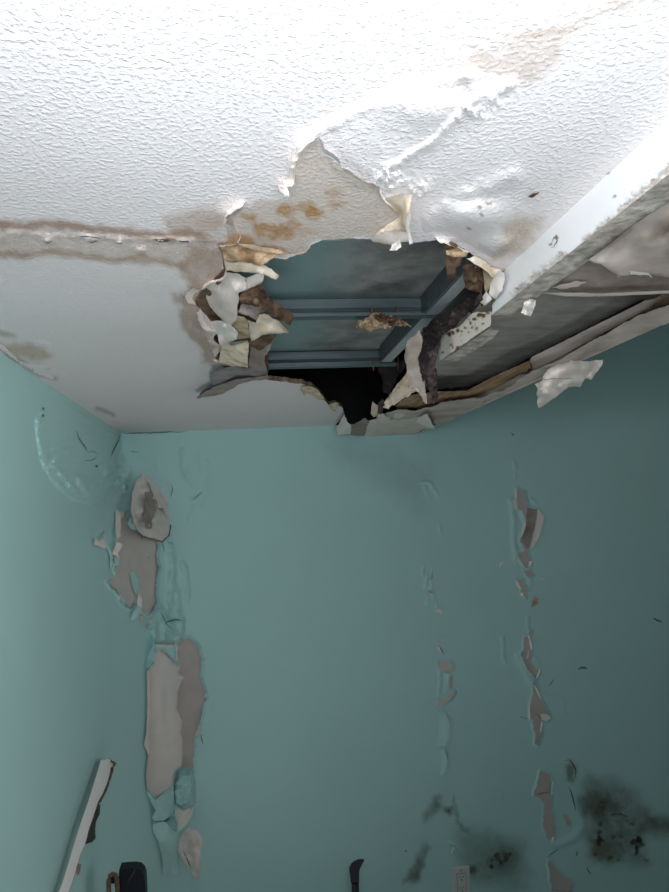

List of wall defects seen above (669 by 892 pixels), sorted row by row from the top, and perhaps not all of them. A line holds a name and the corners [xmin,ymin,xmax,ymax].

leakage [0,222,208,241]
spalling [268,349,417,425]
peeling [535,360,603,408]
peeling [499,458,567,752]
peeling [94,508,209,878]
peeling [531,756,589,892]